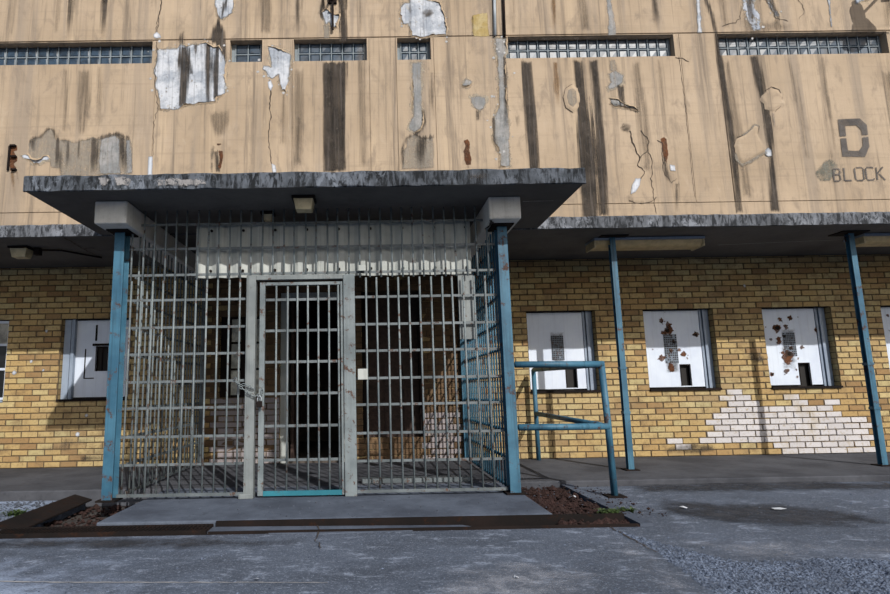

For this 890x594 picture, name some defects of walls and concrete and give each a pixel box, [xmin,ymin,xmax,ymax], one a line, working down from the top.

peeling [399,0,448,42]
peeling [21,128,132,186]
crack [148,0,162,175]
peeling [150,40,235,111]
crack [268,80,276,172]
water stain [323,62,348,172]
peeling [461,13,515,168]
water stain [574,61,608,217]
crack [629,130,657,214]
corrosion [657,138,677,183]
corrosion [652,317,688,372]
corrosion [765,315,805,378]